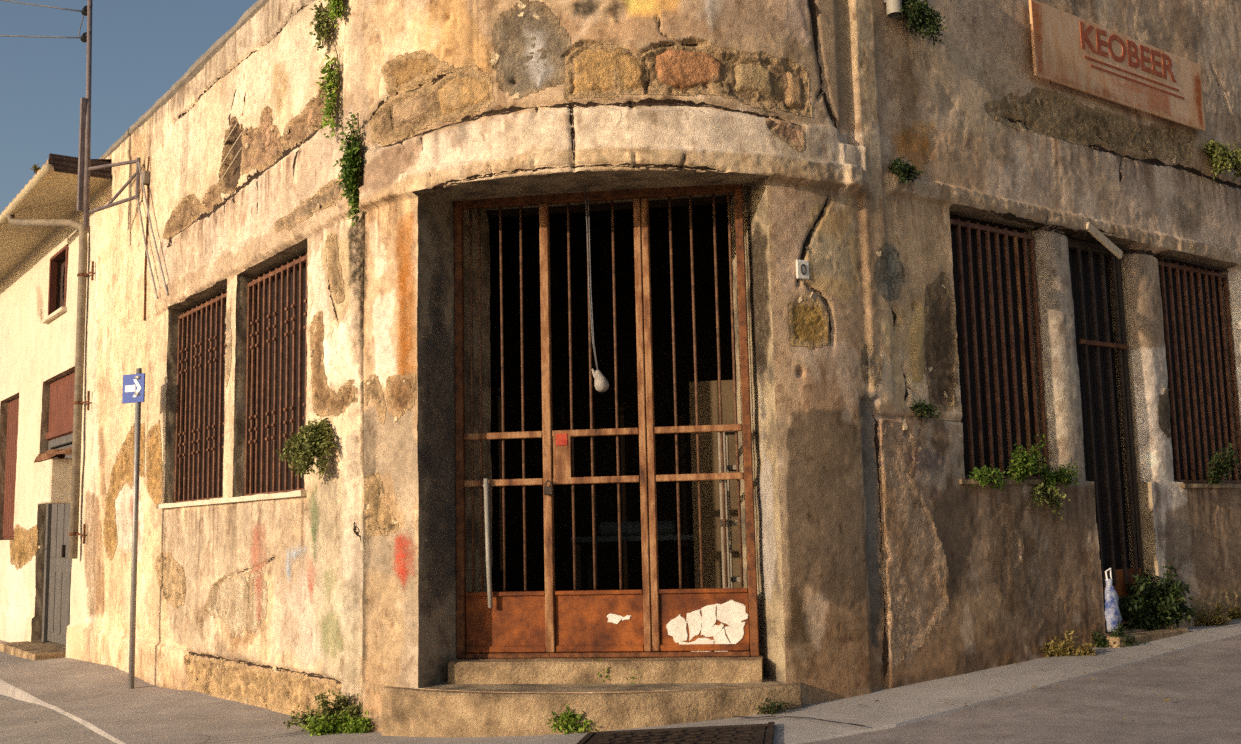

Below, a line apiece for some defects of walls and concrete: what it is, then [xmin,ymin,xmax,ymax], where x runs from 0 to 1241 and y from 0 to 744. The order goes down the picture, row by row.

spalling [162,79,329,240]
damp [573,0,595,14]
crack [370,16,800,190]
flaking render [369,0,812,152]
crack [808,0,837,128]
crack [1058,121,1241,189]
spalling [310,311,416,425]
damp [748,225,770,381]
crack [797,198,832,341]
crack [990,210,1230,272]
spalling [103,420,163,561]
spalling [184,653,342,718]